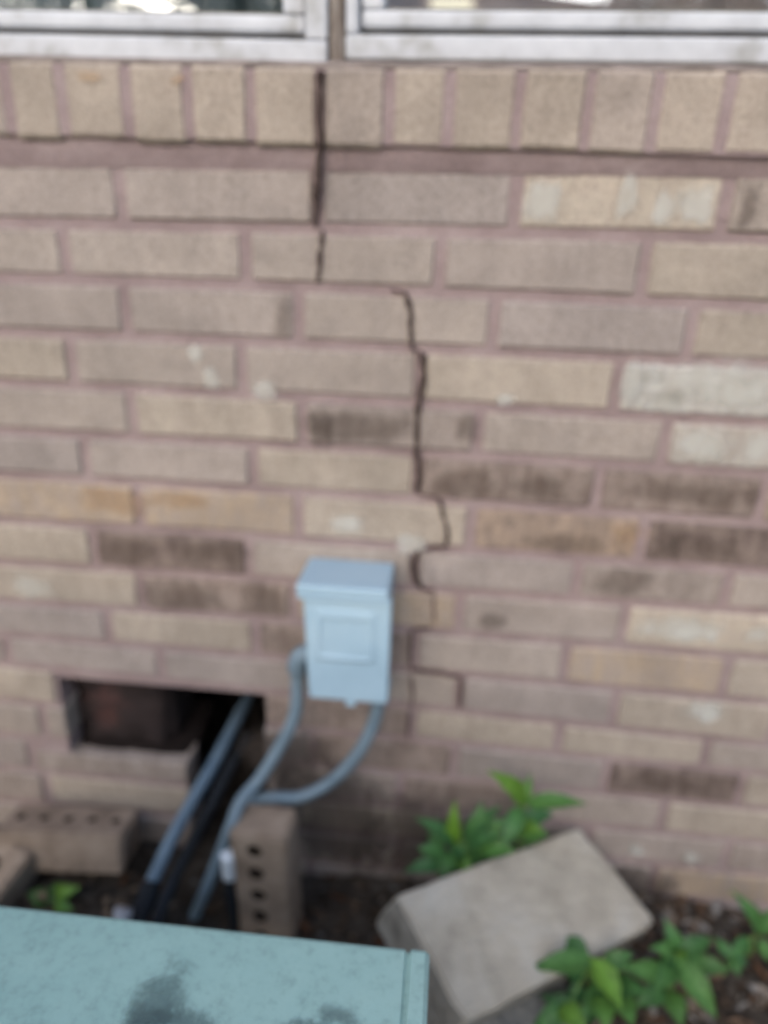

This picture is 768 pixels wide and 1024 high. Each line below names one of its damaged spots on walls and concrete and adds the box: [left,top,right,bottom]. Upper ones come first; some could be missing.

crack [312,70,325,283]
crack [390,290,463,740]